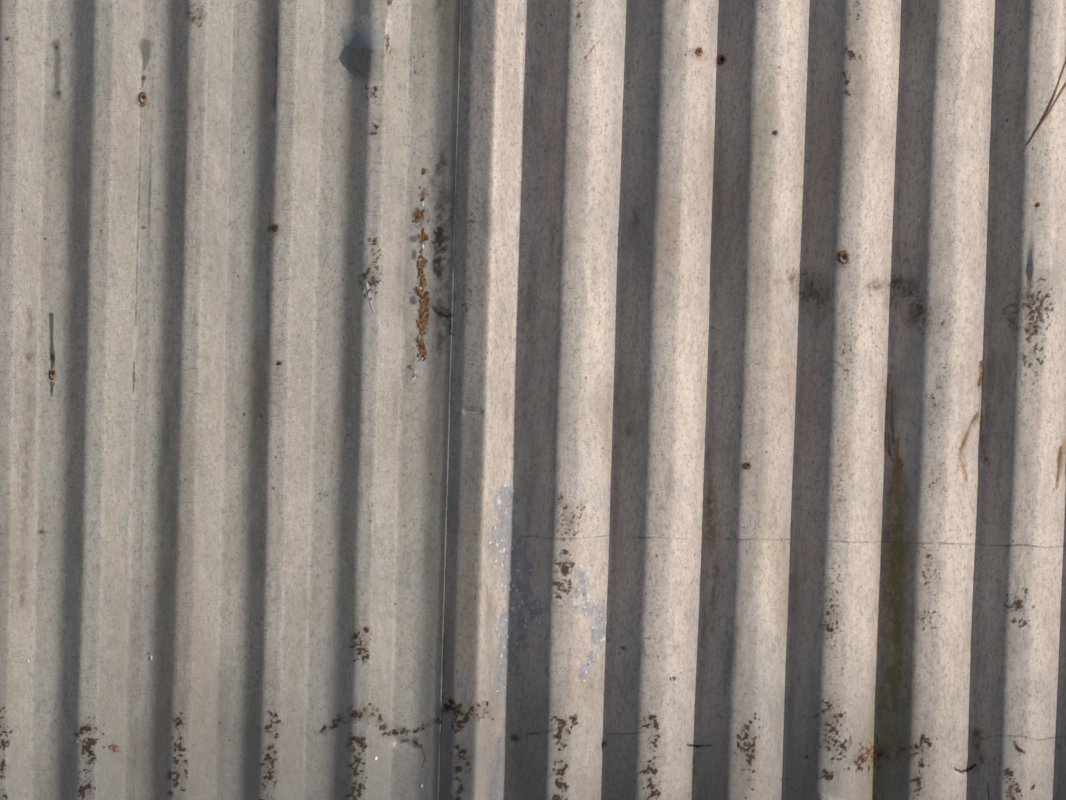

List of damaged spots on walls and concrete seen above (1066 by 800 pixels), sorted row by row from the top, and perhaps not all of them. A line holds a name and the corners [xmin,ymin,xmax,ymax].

corrosion [408,168,431,380]
corrosion [1023,278,1053,368]
corrosion [487,483,607,693]
corrosion [351,627,372,662]
corrosion [0,707,13,800]
corrosion [75,717,118,799]
corrosion [169,712,188,795]
corrosion [319,699,493,800]
corrosion [551,714,578,800]
corrosion [639,714,660,800]
corrosion [737,713,760,773]
corrosion [1003,769,1035,800]